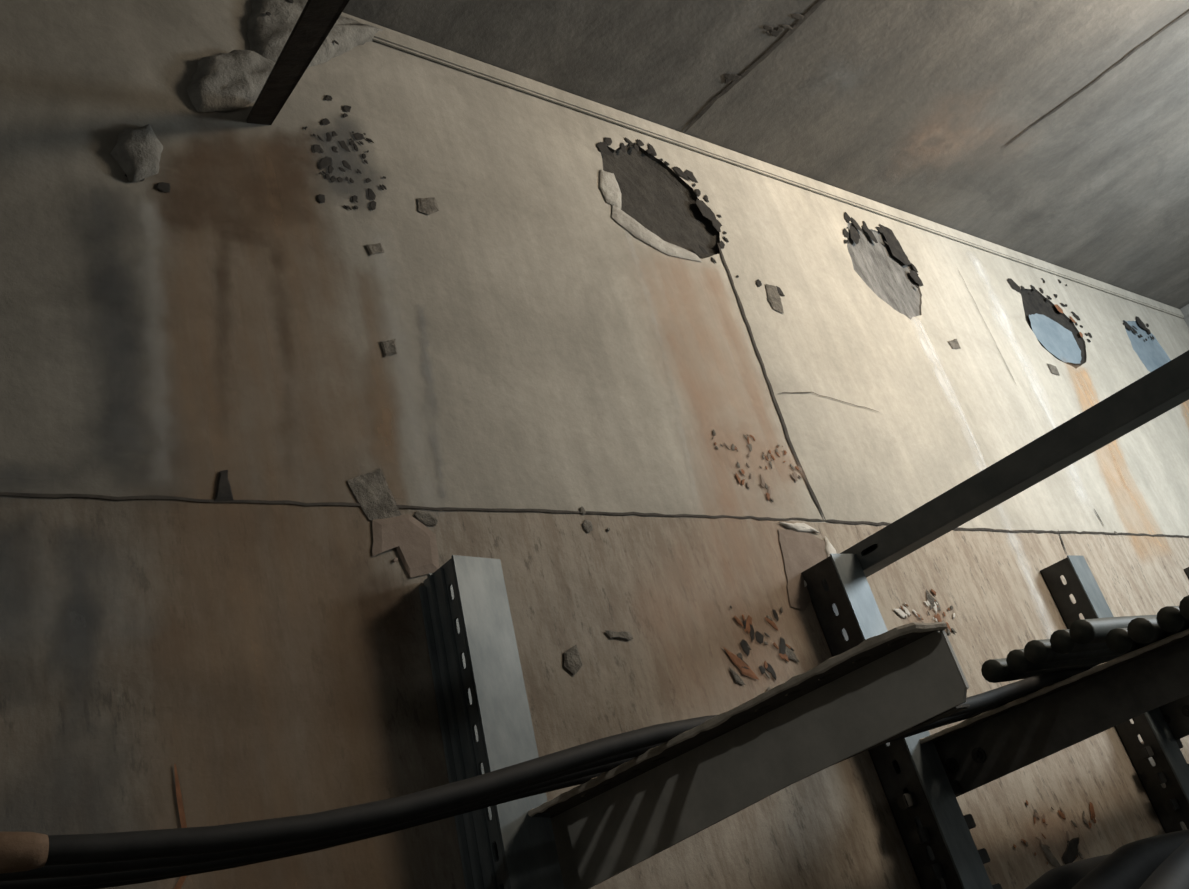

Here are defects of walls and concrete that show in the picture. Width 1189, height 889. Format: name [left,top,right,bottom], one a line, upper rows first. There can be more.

crack [685,0,825,132]
crack [1004,11,1189,148]
spalling [305,95,387,210]
spalling [597,137,729,263]
spalling [843,212,924,320]
crack [0,244,891,532]
spalling [1007,278,1092,375]
corrosion [1077,371,1095,410]
spalling [1123,316,1171,372]
crack [954,509,1189,554]